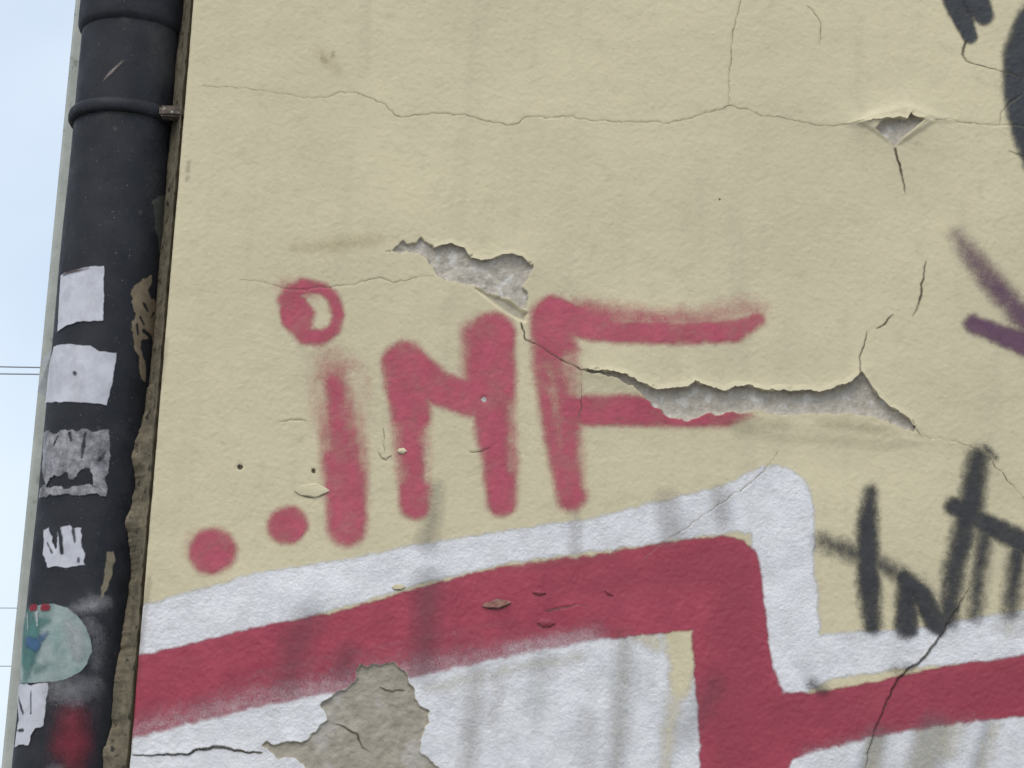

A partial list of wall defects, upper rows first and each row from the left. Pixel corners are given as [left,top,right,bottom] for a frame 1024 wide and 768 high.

crack [962,39,1024,102]
spalling [858,108,926,146]
spalling [394,238,534,308]
peeling [131,275,156,382]
crack [520,322,590,416]
spalling [587,365,918,431]
peeling [100,551,116,599]
crack [880,590,968,717]
spalling [263,663,438,768]